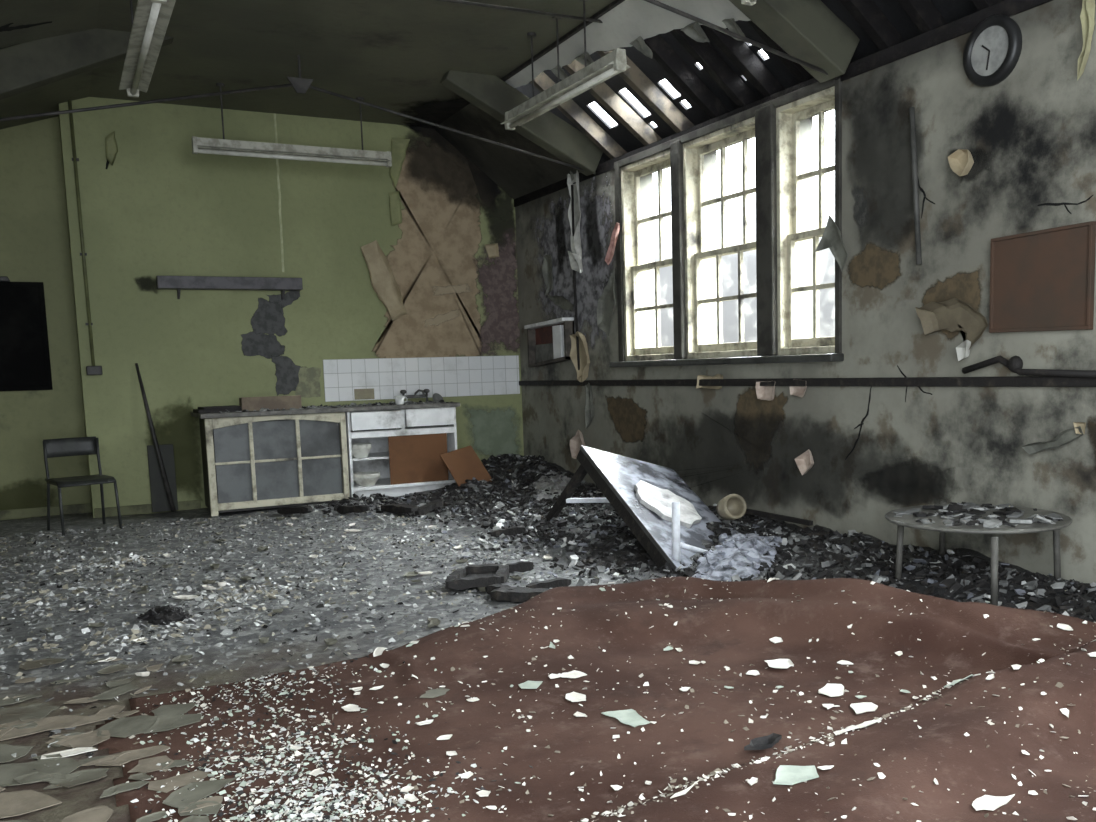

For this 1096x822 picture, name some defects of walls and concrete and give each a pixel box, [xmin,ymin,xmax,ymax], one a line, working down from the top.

peeling [361,132,499,358]
flaking render [241,291,321,398]
flaking render [535,171,648,459]
flaking render [696,374,723,390]
flaking render [735,379,807,426]
crack [854,386,872,440]
flaking render [915,270,988,361]
flaking render [795,449,814,475]